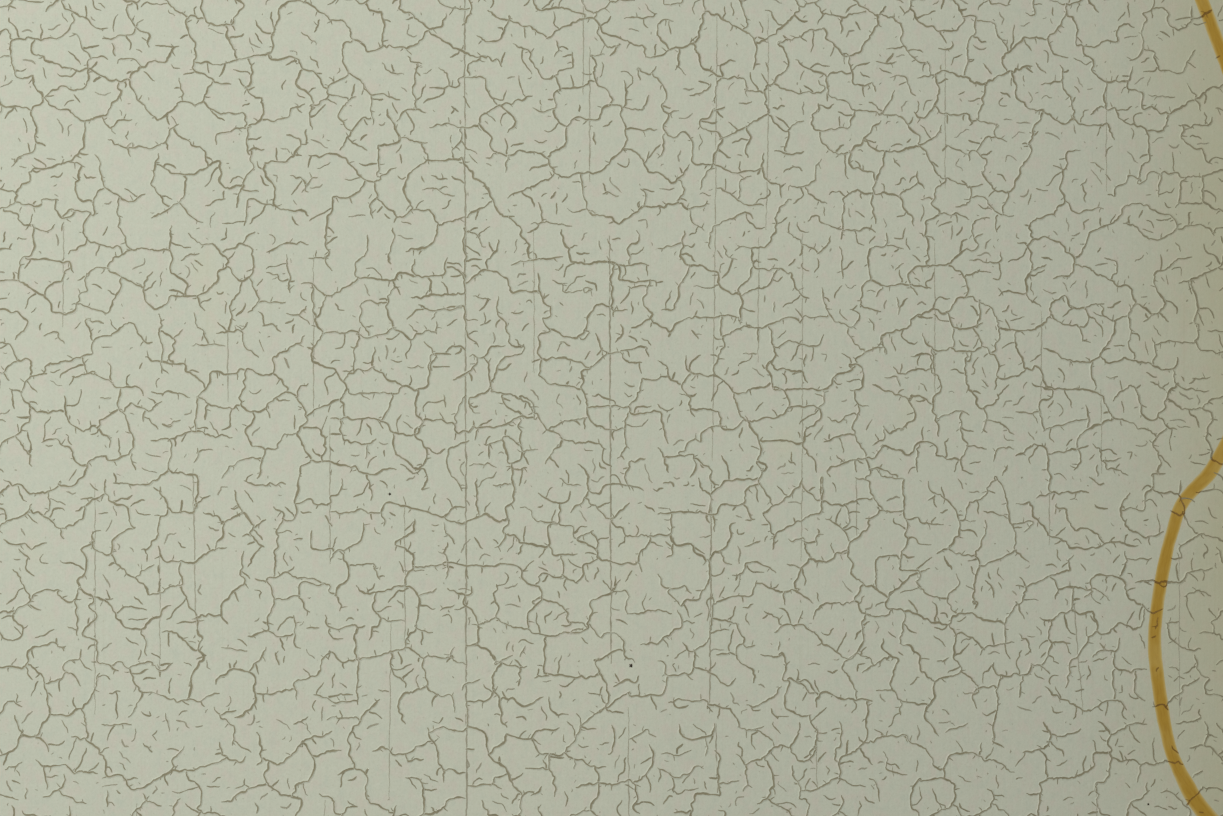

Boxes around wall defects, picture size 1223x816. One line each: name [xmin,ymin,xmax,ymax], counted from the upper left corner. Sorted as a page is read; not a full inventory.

crack [421,173,464,209]
crack [0,232,23,252]
crack [266,234,309,253]
crack [266,254,295,293]
crack [837,246,853,279]
crack [39,323,65,344]
crack [192,312,225,348]
crack [0,693,22,716]
crack [1153,618,1223,765]
crack [597,724,656,755]
crack [0,780,50,816]
crack [822,795,848,816]